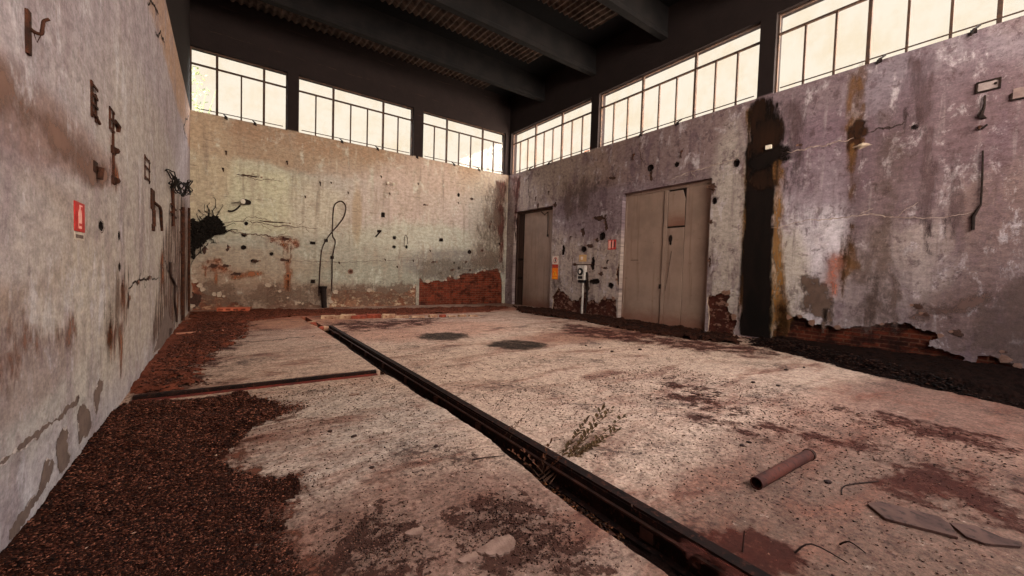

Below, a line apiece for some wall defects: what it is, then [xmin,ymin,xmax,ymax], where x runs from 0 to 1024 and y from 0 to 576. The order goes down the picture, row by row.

crack [790,122,905,153]
water stain [737,97,805,338]
crack [773,205,971,228]
crack [129,256,177,304]
rust [203,259,262,283]
rust [269,238,299,290]
flaking render [265,249,503,309]
flaking render [552,215,619,318]
water stain [56,314,77,346]
water stain [104,270,129,375]
flaking render [771,303,1023,369]
peeling [0,378,104,540]